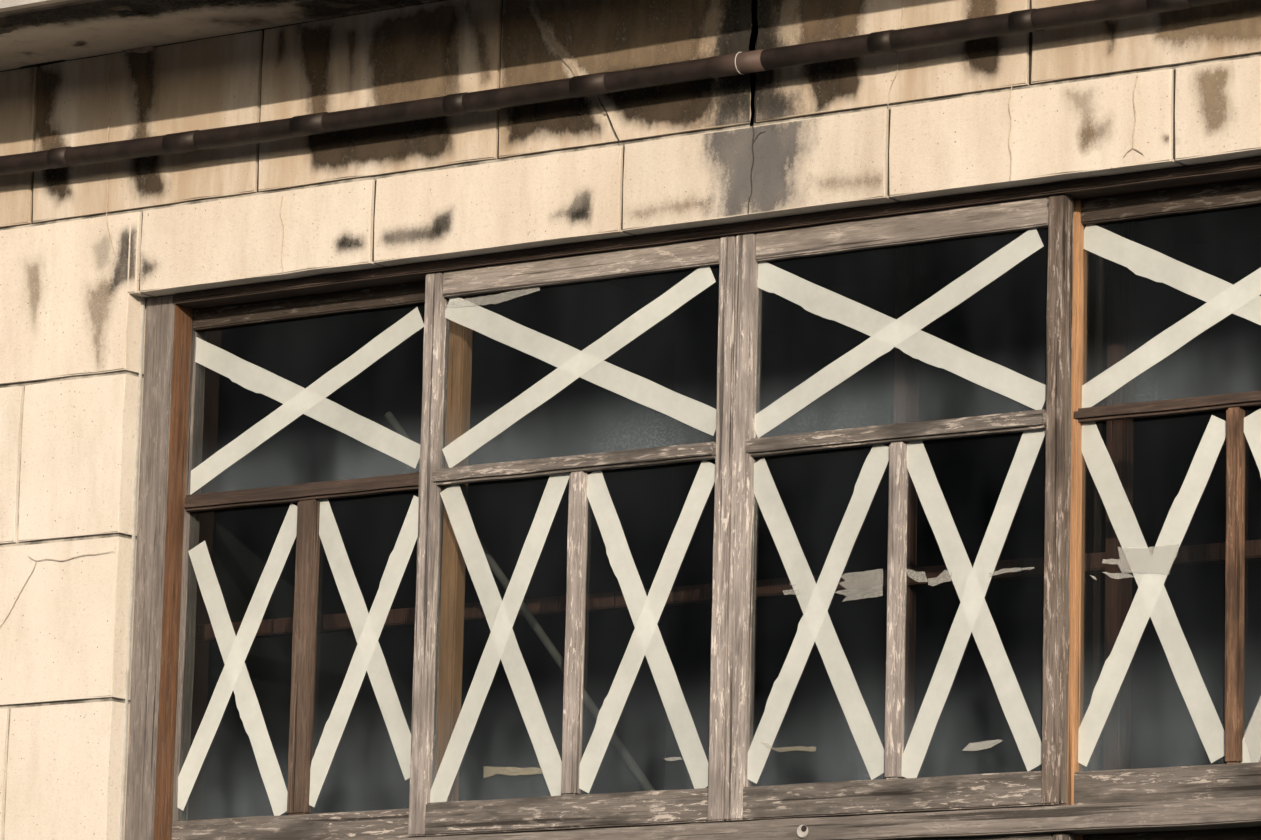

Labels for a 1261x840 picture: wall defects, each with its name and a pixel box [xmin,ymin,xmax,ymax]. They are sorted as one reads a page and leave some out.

leakage [799,0,865,44]
leakage [43,167,70,199]
leakage [130,155,164,196]
leakage [308,116,452,168]
leakage [0,0,783,114]
leakage [507,97,600,142]
leakage [603,69,801,216]
crack [748,125,764,214]
leakage [804,57,860,110]
crack [1124,74,1143,157]
leakage [92,233,152,301]
crack [0,551,112,627]